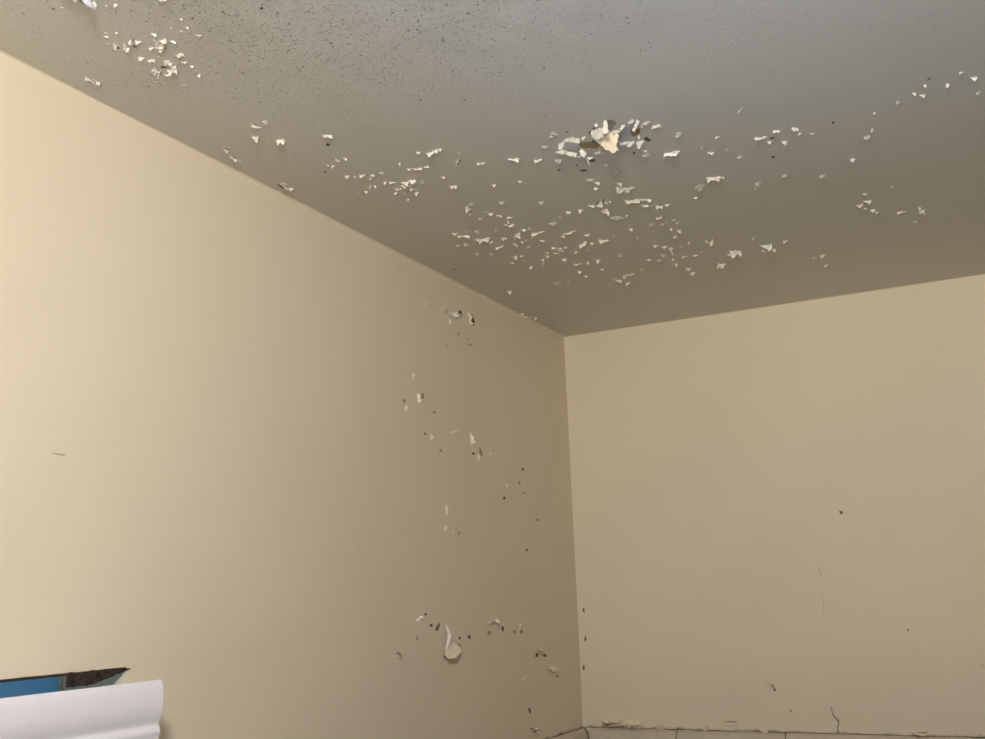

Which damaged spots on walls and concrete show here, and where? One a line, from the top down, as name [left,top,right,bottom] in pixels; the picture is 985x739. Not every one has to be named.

peeling [45,0,117,10]
peeling [104,19,202,83]
peeling [344,149,442,201]
peeling [451,119,714,286]
peeling [693,176,724,199]
peeling [717,250,742,269]
peeling [751,236,788,253]
peeling [442,305,475,346]
peeling [416,613,471,660]